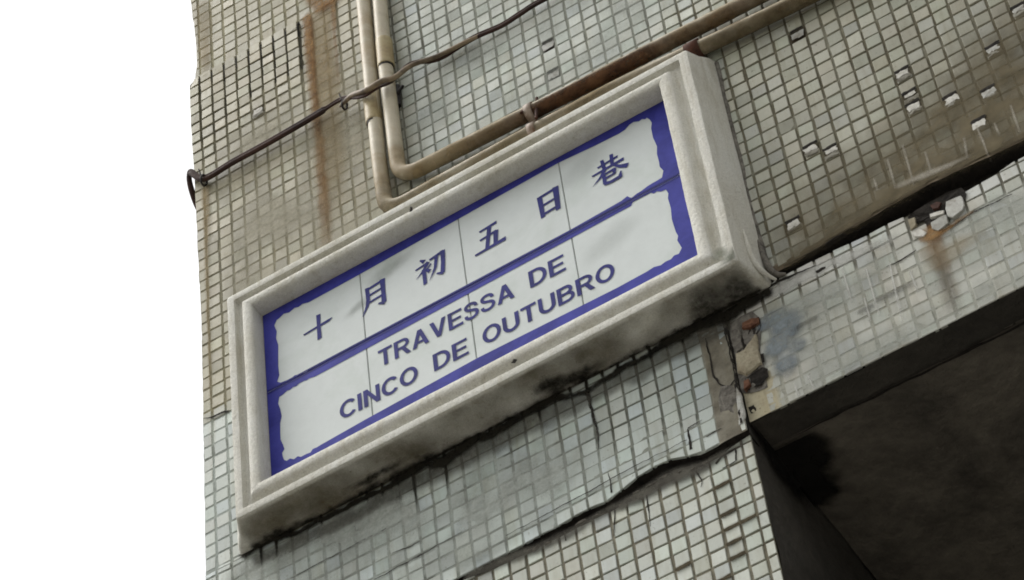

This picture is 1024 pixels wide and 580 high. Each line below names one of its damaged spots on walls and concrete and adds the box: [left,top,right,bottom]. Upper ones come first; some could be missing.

rust [303,0,336,134]
water stain [241,123,283,150]
crack [768,140,1024,288]
spalling [908,188,966,239]
rust [922,220,958,243]
water stain [238,245,875,580]
crack [457,306,759,580]
spalling [719,311,769,425]